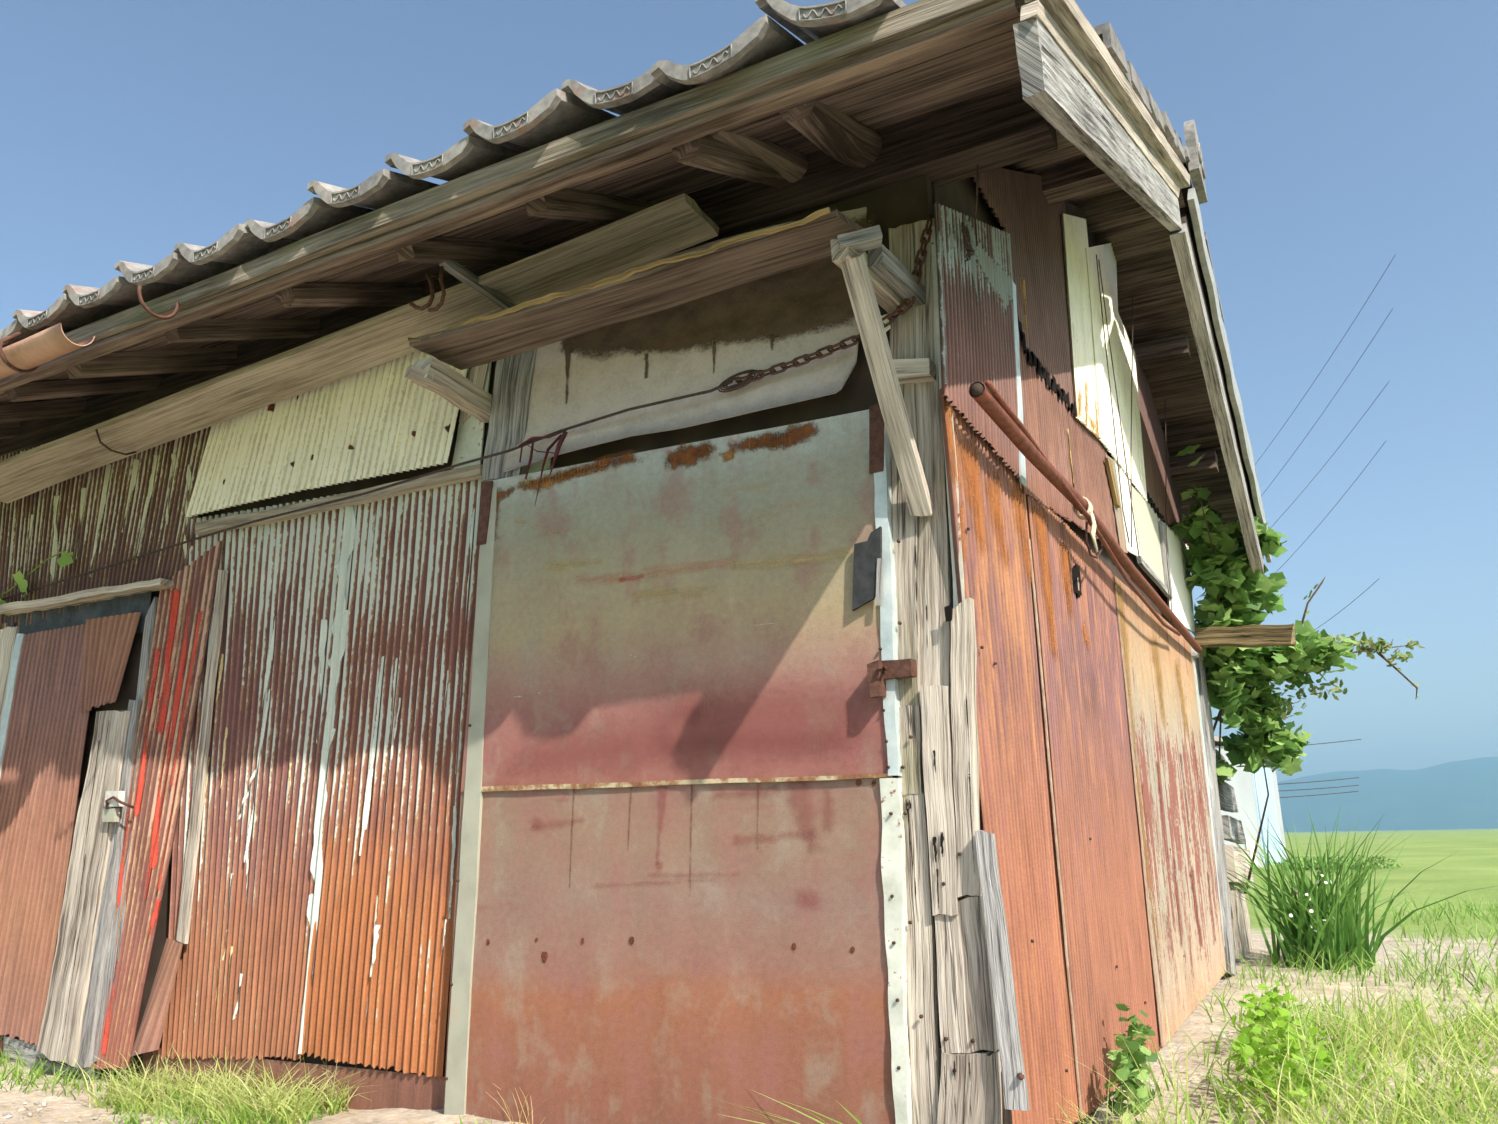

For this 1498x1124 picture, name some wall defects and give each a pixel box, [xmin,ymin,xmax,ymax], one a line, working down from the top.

peeling [937,220,1013,384]
rust [495,451,636,525]
rust [665,422,818,469]
rust [944,403,1072,653]
rust [1067,382,1099,488]
peeling [229,617,276,913]
peeling [298,506,356,1054]
peeling [359,656,401,856]
rust [1154,649,1198,825]
peeling [216,930,244,1020]
peeling [370,896,380,977]
peeling [442,806,457,947]